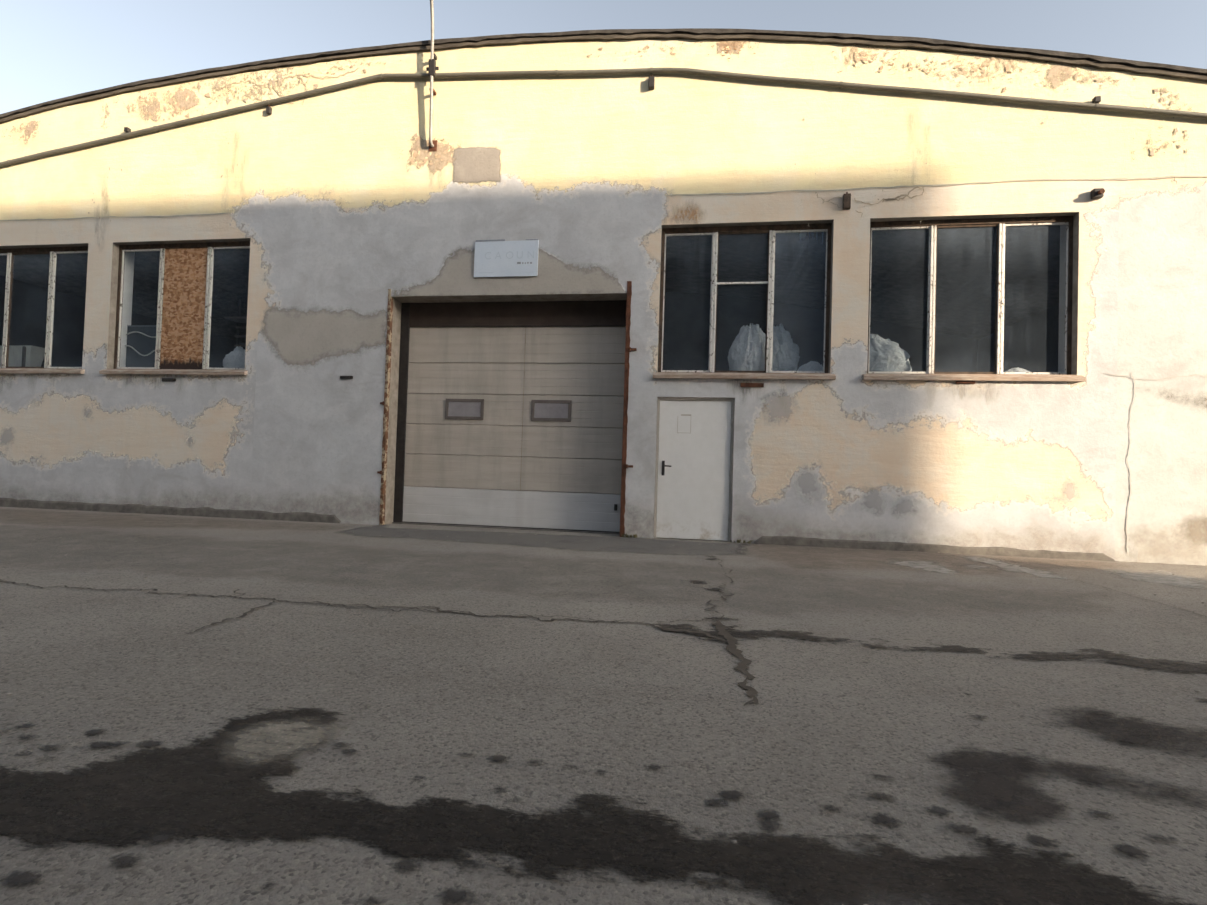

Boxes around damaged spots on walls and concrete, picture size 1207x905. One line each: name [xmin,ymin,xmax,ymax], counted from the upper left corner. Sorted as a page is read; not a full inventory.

flaking render [2,118,58,144]
flaking render [100,58,412,130]
flaking render [399,132,461,175]
peeling [809,44,1206,160]
crack [816,187,924,217]
flaking render [0,172,1207,566]